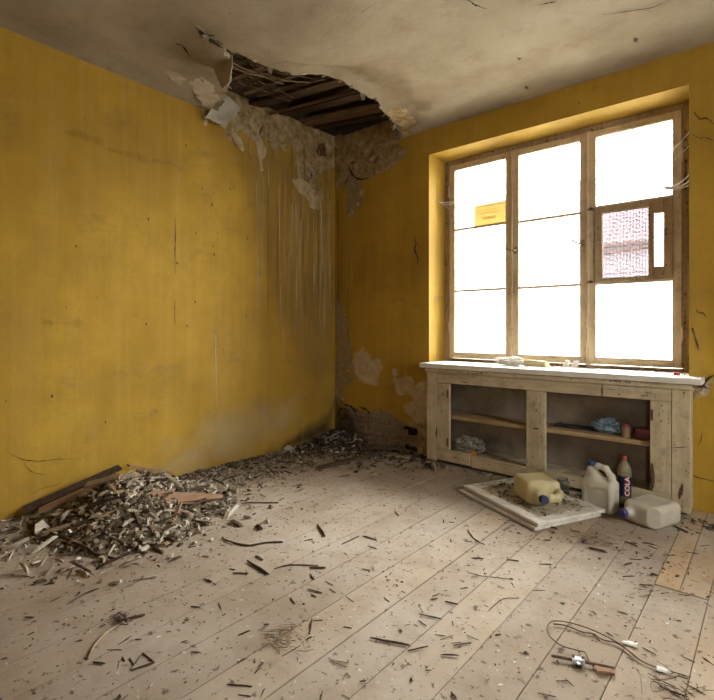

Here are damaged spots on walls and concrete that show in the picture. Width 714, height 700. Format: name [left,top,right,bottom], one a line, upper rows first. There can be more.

flaking render [165,71,417,217]
leakage [279,141,332,329]
flaking render [335,295,427,455]